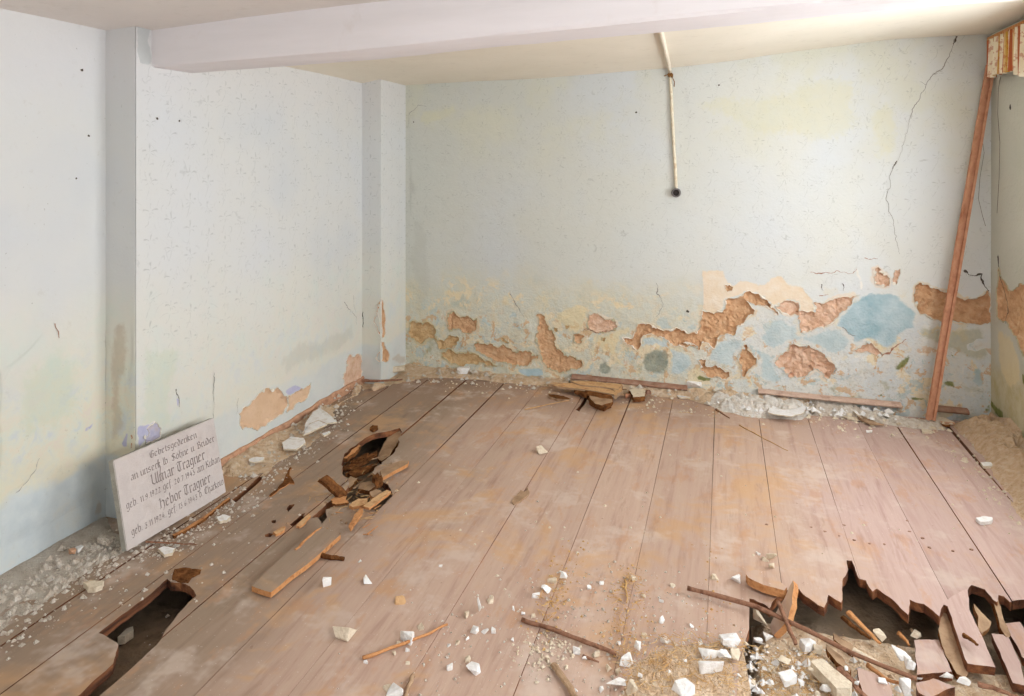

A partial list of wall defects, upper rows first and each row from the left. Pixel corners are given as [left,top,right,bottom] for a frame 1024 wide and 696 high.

crack [813,36,958,296]
spalling [342,299,390,386]
spalling [407,263,1024,387]
crack [964,256,1008,324]
spalling [239,383,311,431]